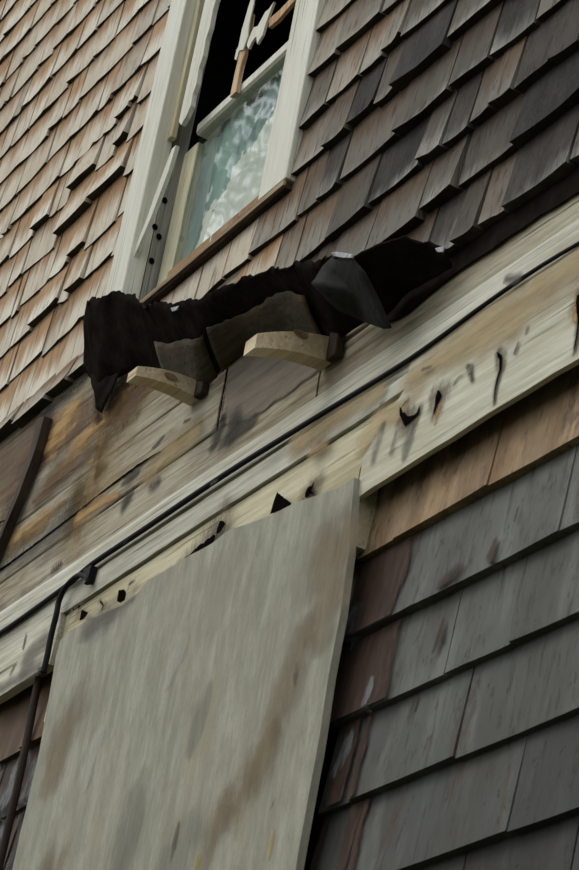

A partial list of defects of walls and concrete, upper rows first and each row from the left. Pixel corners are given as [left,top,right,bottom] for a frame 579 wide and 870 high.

crack [571,289,579,354]
crack [397,388,446,432]
crack [493,347,505,406]
water stain [0,372,144,573]
peeling [309,536,412,870]
peeling [0,748,38,840]